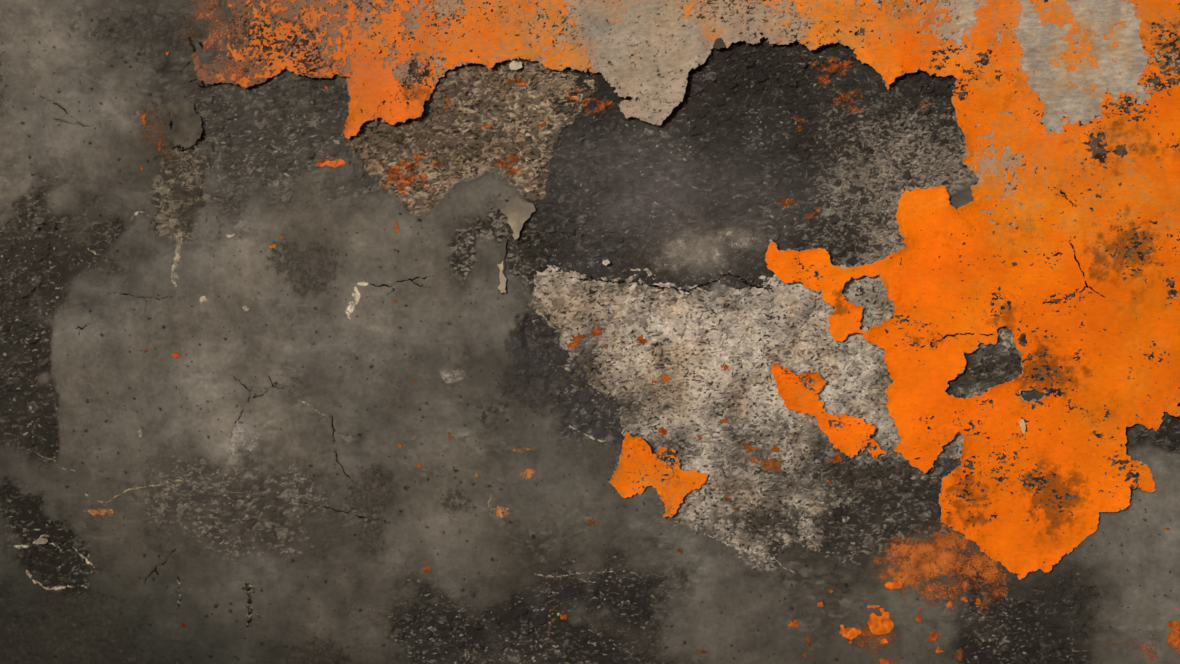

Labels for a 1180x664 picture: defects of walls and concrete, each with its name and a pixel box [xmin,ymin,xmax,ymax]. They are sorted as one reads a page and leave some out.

peeling [1102,19,1131,49]
crack [230,376,284,455]
flaking render [1125,412,1180,473]
flaking render [941,542,971,566]
flaking render [913,556,1129,664]
peeling [1167,621,1180,648]